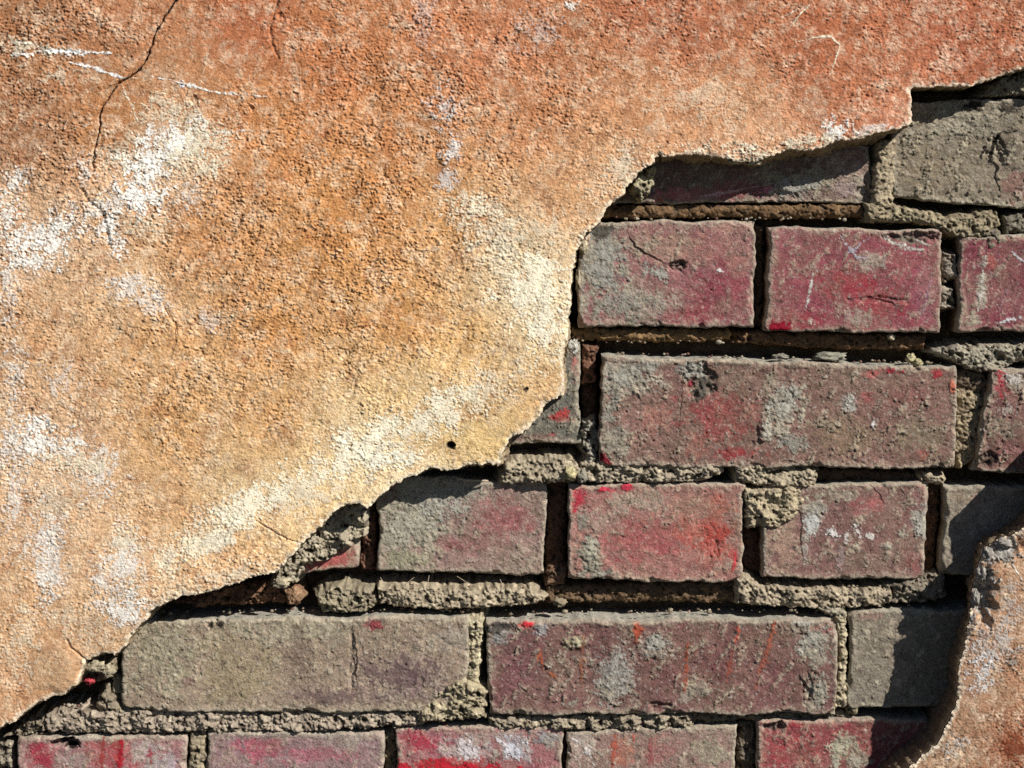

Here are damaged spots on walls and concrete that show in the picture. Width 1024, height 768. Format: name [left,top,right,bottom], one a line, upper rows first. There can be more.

peeling [0,34,76,84]
crack [93,0,177,162]
spalling [910,68,1024,111]
peeling [368,126,908,578]
peeling [0,88,241,730]
spalling [272,505,345,588]
spalling [486,621,552,644]
peeling [562,632,673,714]
spalling [793,619,836,712]
spalling [877,508,1024,768]
spalling [60,736,78,749]
peeling [397,729,500,768]